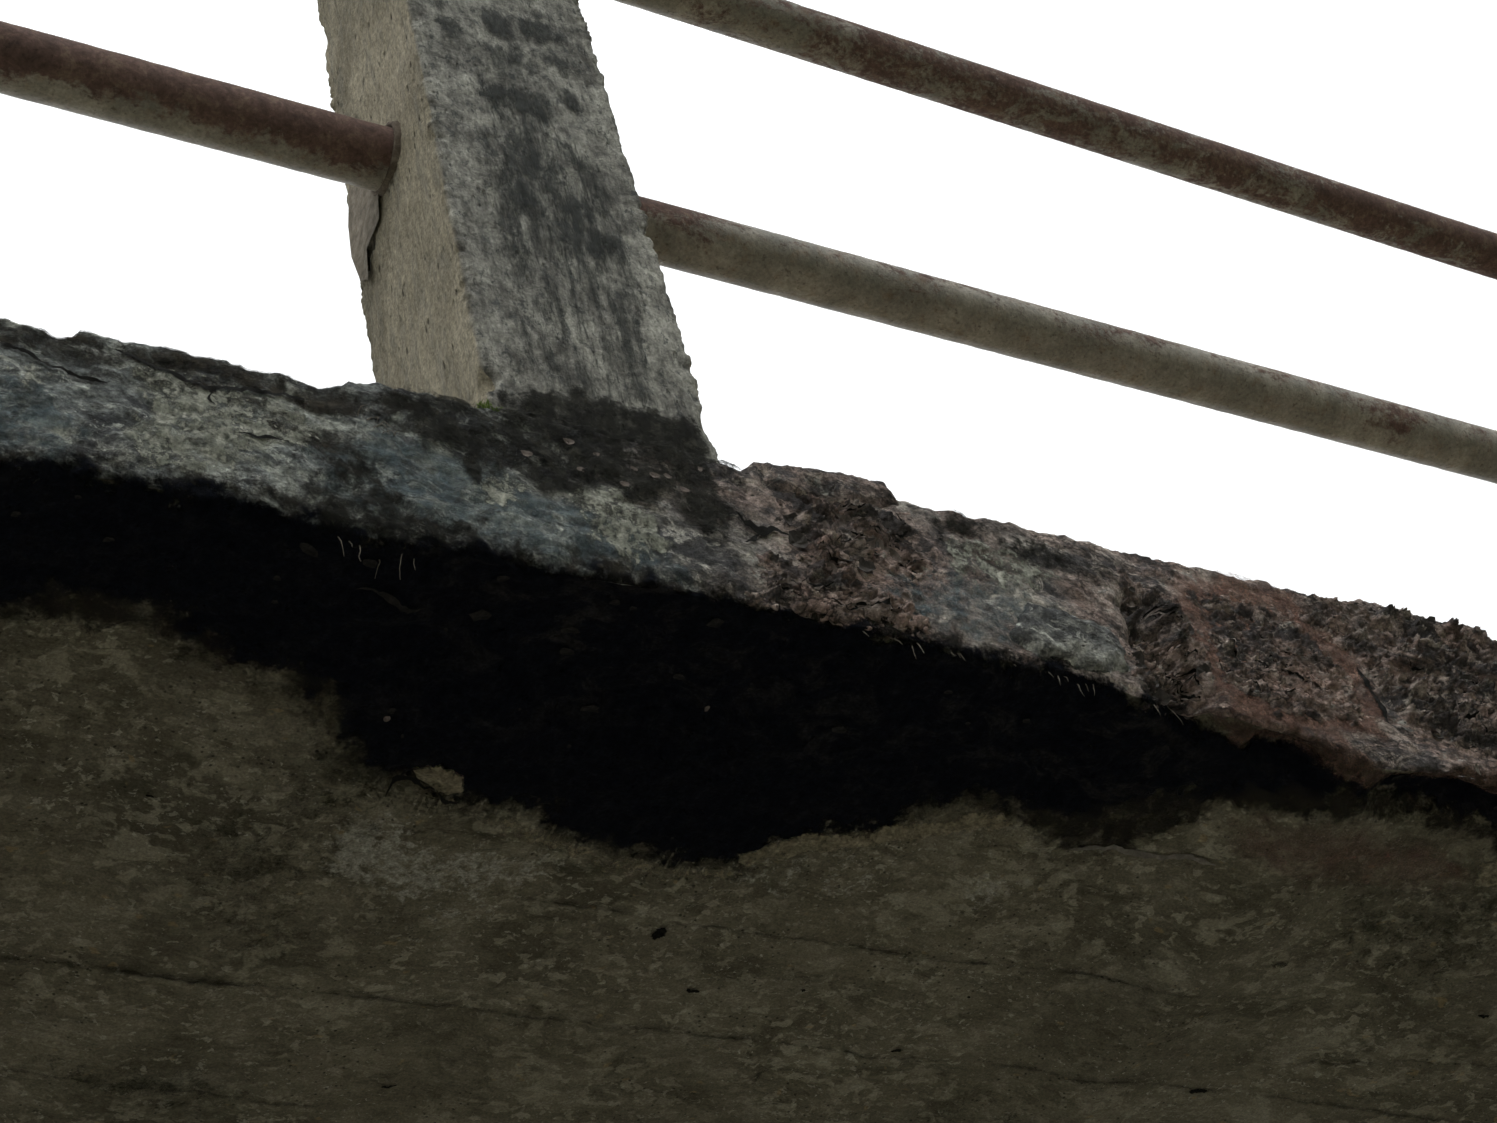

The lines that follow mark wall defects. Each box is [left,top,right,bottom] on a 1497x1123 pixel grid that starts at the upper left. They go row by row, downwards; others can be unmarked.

damp [0,453,1497,982]